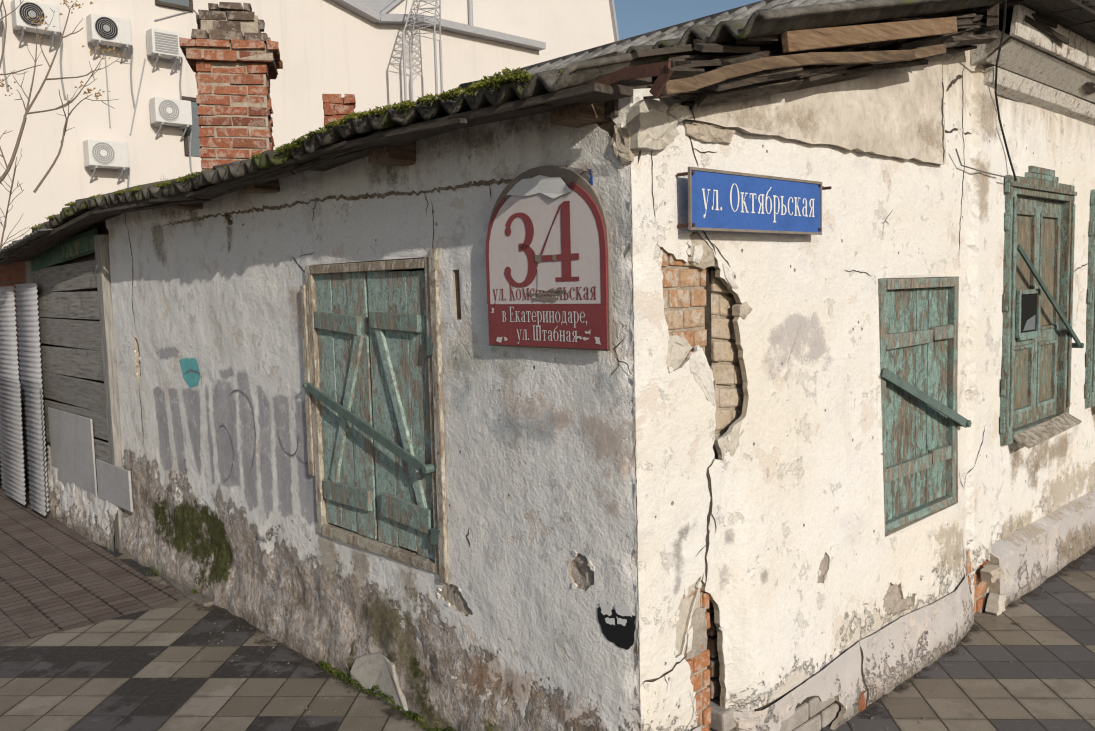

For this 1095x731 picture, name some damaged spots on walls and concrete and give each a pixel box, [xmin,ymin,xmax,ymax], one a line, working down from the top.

crack [125,178,512,329]
flaking render [657,231,753,459]
crack [610,150,687,716]
damp [1013,438,1068,486]
damp [153,499,168,540]
crack [697,459,717,587]
spalling [571,550,595,590]
flaking render [966,550,1015,616]
flaking render [674,579,736,731]
flaking render [754,677,812,712]
flaking render [780,696,847,731]
crack [857,641,869,709]